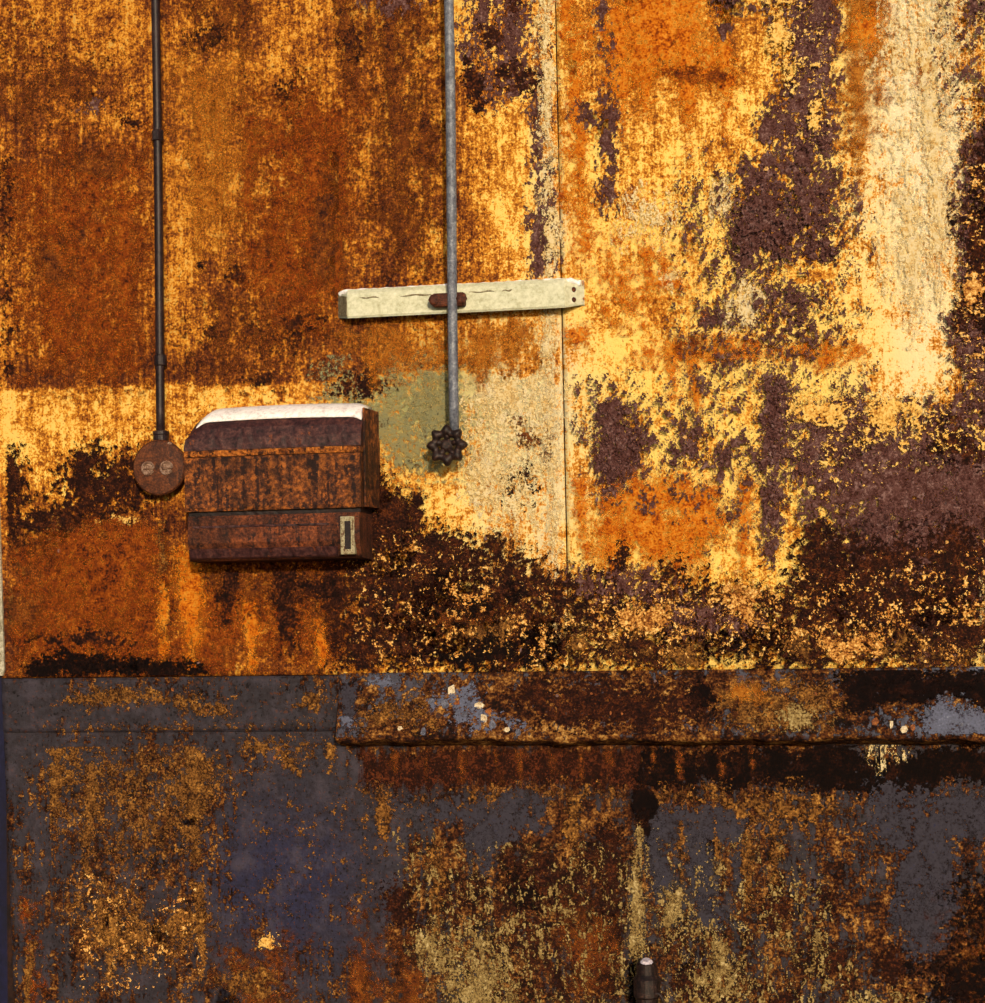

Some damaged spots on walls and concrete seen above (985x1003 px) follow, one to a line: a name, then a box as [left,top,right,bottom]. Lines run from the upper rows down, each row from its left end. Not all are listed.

corrosion [0,0,538,407]
corrosion [548,0,871,414]